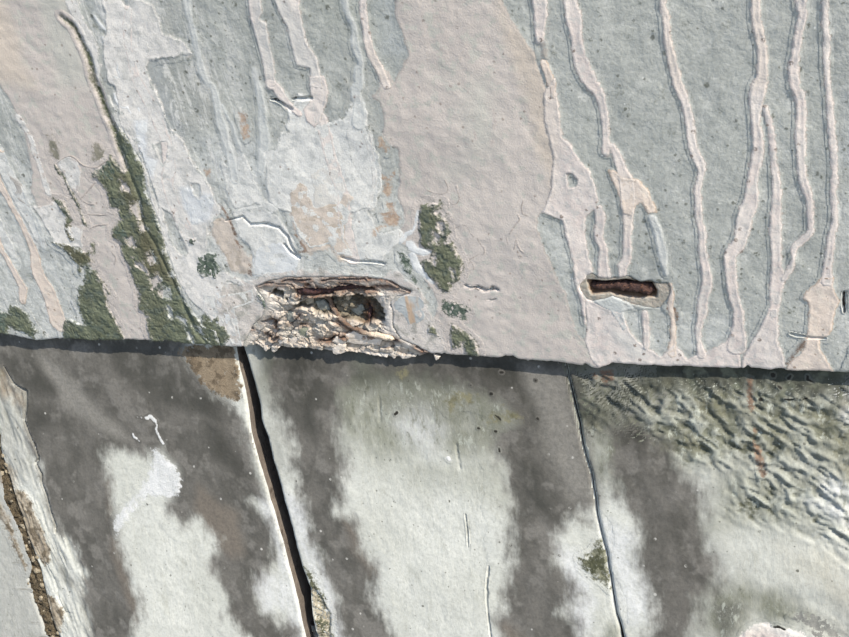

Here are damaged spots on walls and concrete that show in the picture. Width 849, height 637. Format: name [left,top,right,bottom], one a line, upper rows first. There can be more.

spalling [243,277,441,360]
corrosion [297,284,395,341]
corrosion [591,279,683,324]
water stain [632,417,659,431]
water stain [646,403,675,432]
efflorescence [107,413,187,541]
peeling [783,607,849,637]